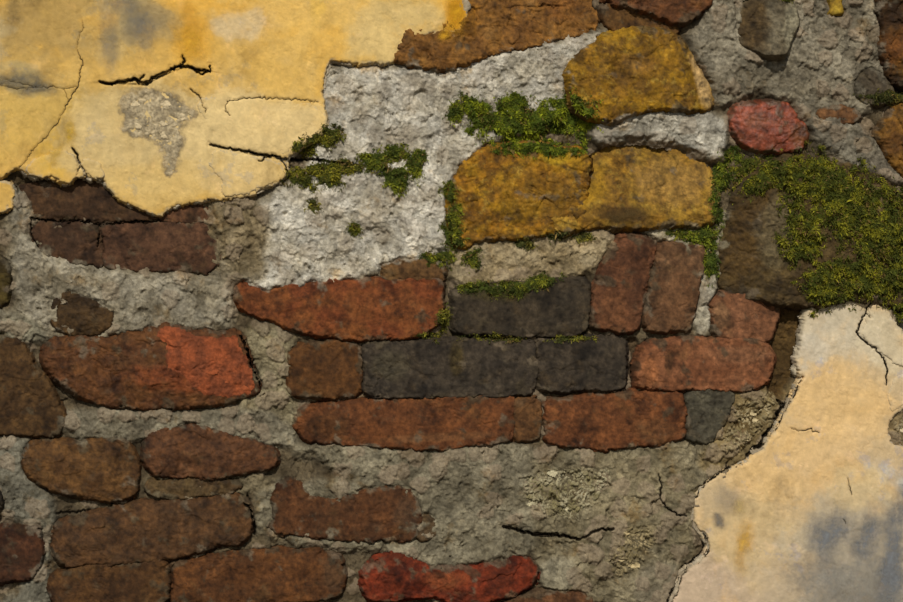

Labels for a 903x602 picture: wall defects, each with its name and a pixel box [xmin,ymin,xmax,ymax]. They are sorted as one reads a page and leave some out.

flaking render [0,180,18,215]
flaking render [25,150,105,185]
crack [0,52,318,161]
spalling [120,88,228,177]
flaking render [208,103,328,197]
crack [209,144,358,165]
crack [856,303,888,385]
flaking render [862,304,903,441]
spalling [718,389,780,457]
leakage [802,506,903,602]